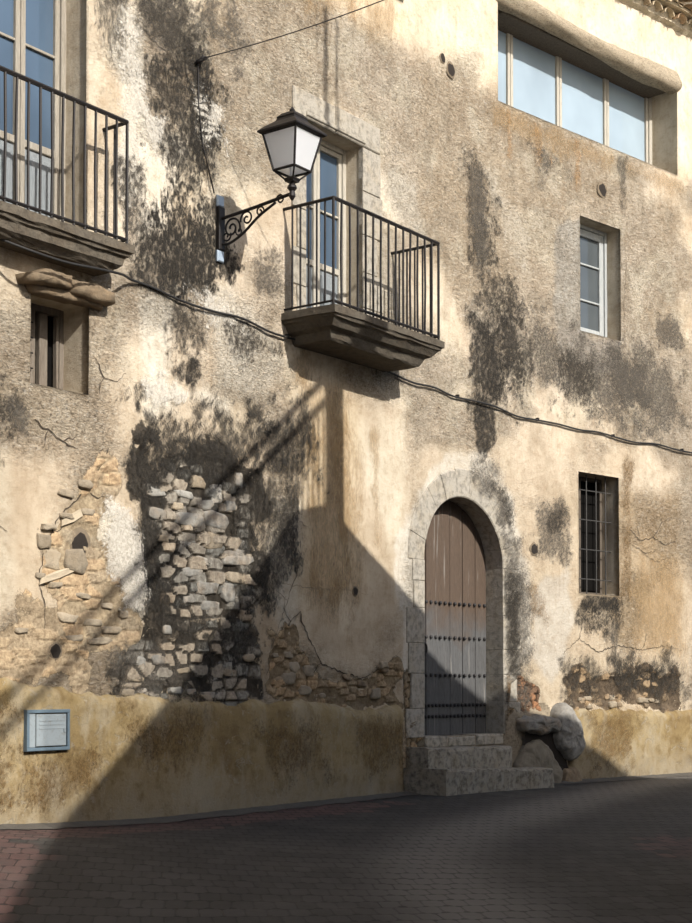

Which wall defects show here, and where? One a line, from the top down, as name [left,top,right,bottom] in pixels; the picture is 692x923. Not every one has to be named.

damp [462,148,535,462]
damp [656,316,685,350]
damp [94,0,329,767]
damp [555,348,653,408]
damp [0,391,30,440]
damp [547,508,567,533]
flaking render [0,420,424,747]
flaking render [563,662,681,713]
damp [0,746,102,811]